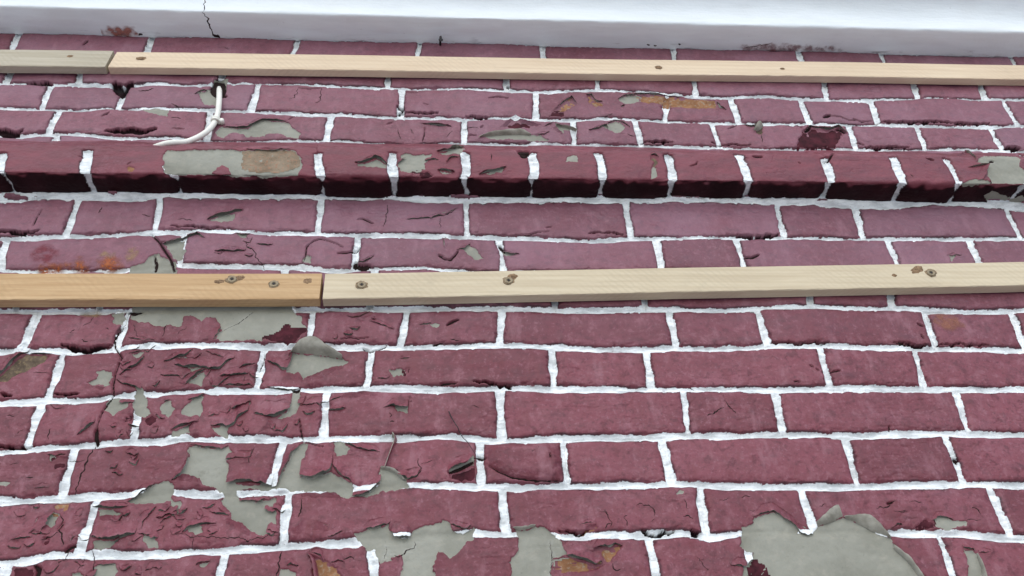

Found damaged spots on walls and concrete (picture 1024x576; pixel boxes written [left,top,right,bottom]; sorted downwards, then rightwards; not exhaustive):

crack [202,1,227,49]
peeling [163,117,302,178]
peeling [355,92,727,179]
peeling [796,124,847,151]
peeling [957,150,1024,202]
corrosion [40,262,87,274]
crack [142,214,176,273]
crack [69,313,142,495]
peeling [0,306,432,576]
peeling [355,518,474,576]
peeling [511,519,622,576]
peeling [730,502,924,576]